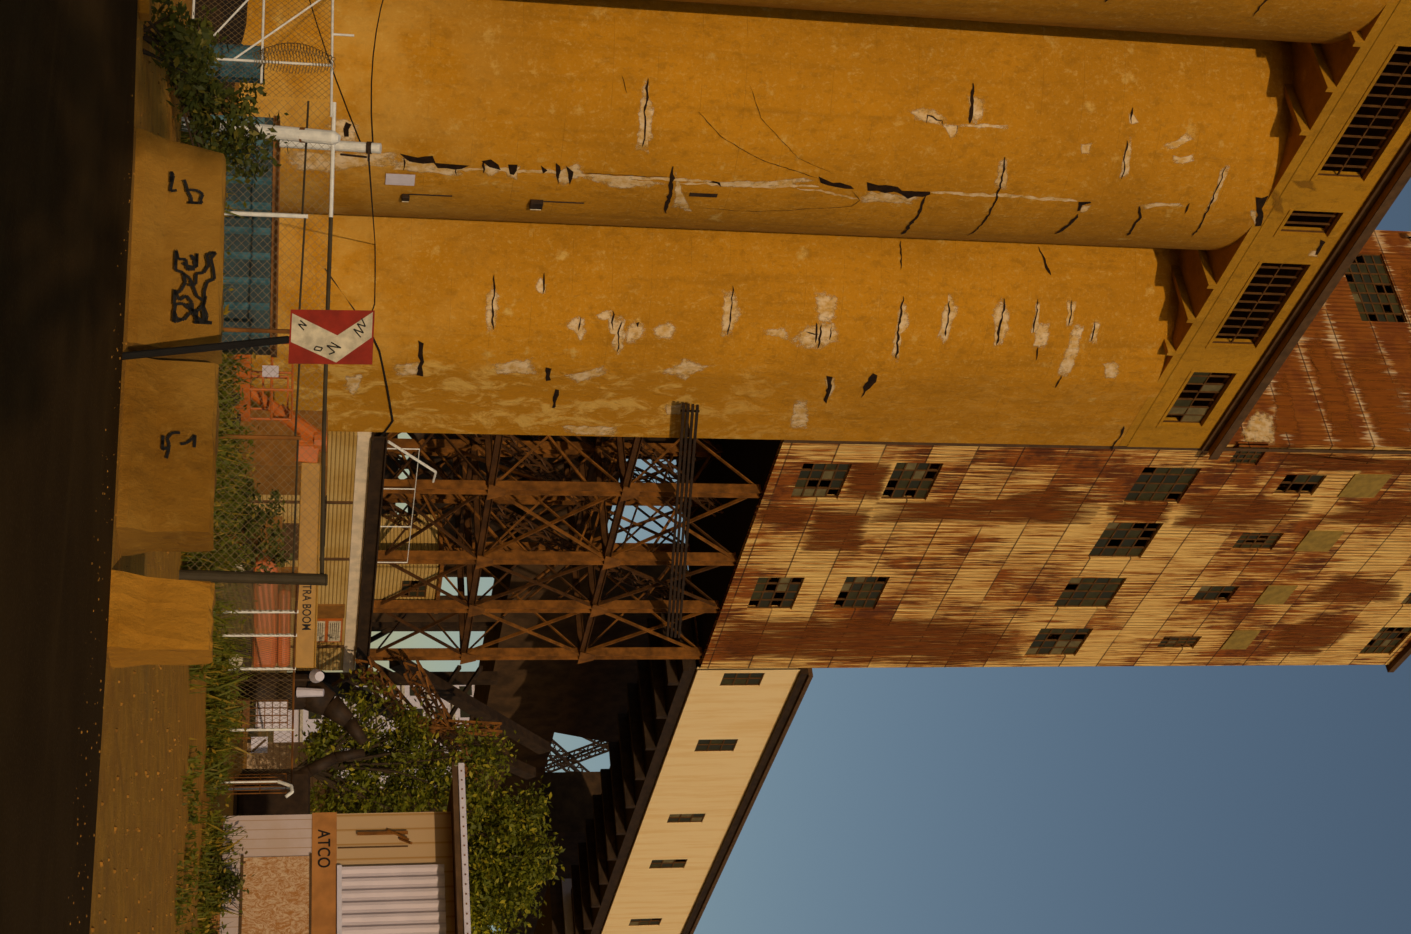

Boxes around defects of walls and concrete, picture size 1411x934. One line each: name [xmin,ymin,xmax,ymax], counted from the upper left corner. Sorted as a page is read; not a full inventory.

peeling [286,119,1077,204]
crack [585,77,860,213]
spalling [911,83,1007,138]
crack [1120,108,1228,236]
spalling [567,310,675,352]
spalling [766,293,837,349]
crack [892,196,926,357]
crack [1031,202,1100,343]
rust [1274,353,1411,474]
rust [755,464,1411,554]
rust [712,617,1021,665]
rust [1265,575,1402,654]